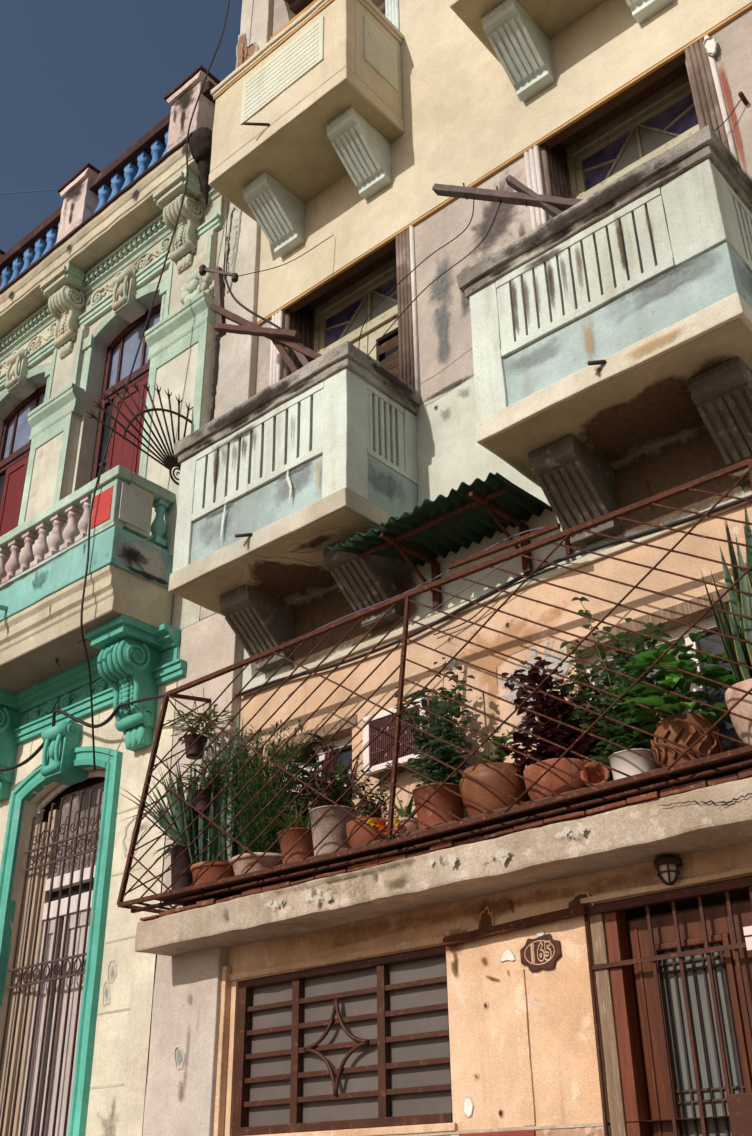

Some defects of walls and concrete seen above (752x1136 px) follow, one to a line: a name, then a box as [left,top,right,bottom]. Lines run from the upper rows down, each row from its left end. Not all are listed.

damp [472,161,679,330]
damp [635,258,713,304]
damp [431,263,468,360]
damp [514,345,553,367]
damp [635,331,676,355]
damp [279,461,309,498]
damp [205,503,232,539]
damp [116,537,169,585]
crack [660,793,752,809]